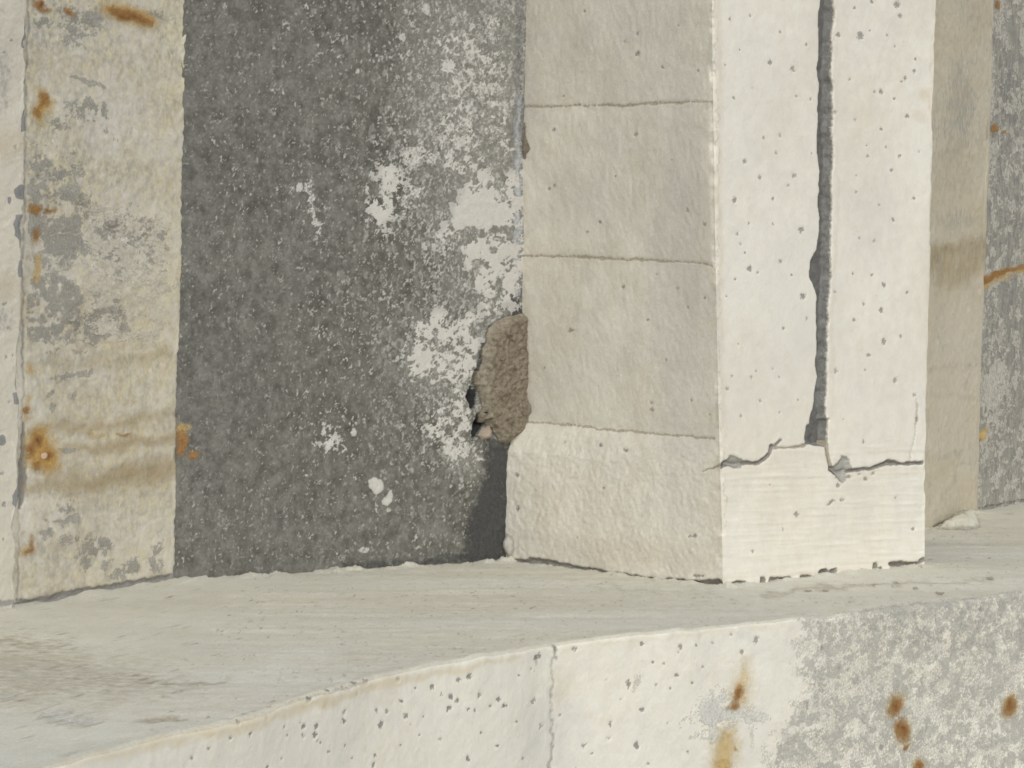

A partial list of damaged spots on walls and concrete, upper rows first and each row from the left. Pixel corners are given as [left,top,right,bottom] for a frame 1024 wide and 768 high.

corrosion [103,4,157,27]
corrosion [33,89,52,123]
peeling [288,173,343,255]
spalling [358,1,531,476]
crack [524,0,923,474]
corrosion [984,265,1024,287]
corrosion [24,427,60,474]
peeling [312,421,357,457]
corrosion [728,682,743,710]
corrosion [890,696,910,750]
corrosion [1003,696,1016,715]
corrosion [712,732,736,768]